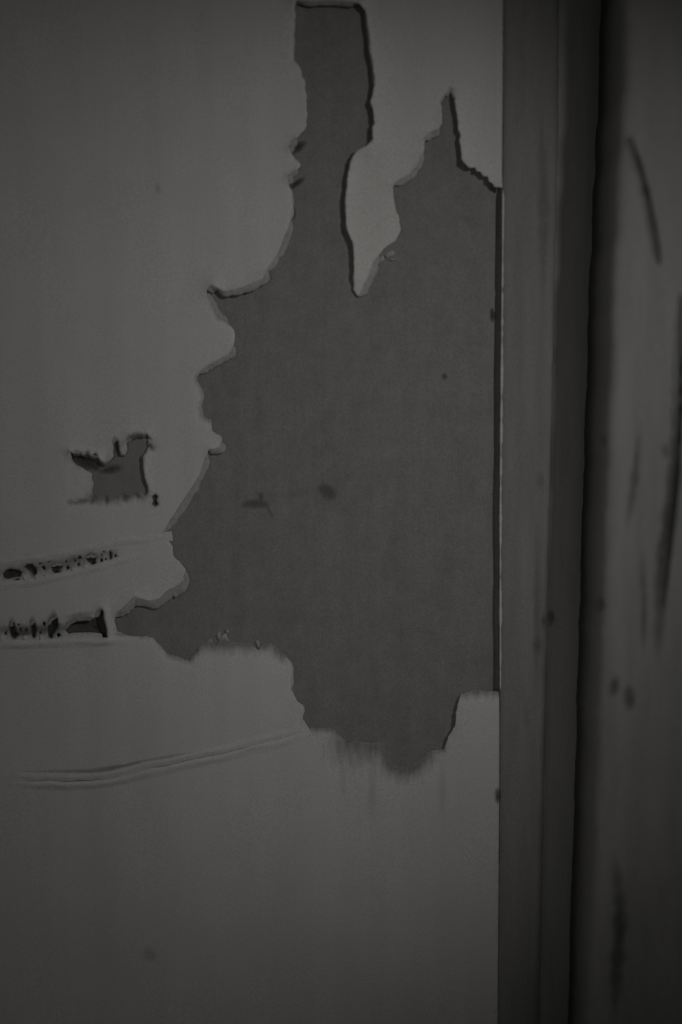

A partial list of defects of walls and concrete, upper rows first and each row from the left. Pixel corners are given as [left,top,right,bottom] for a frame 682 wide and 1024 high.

peeling [71,433,158,506]
peeling [114,0,505,767]